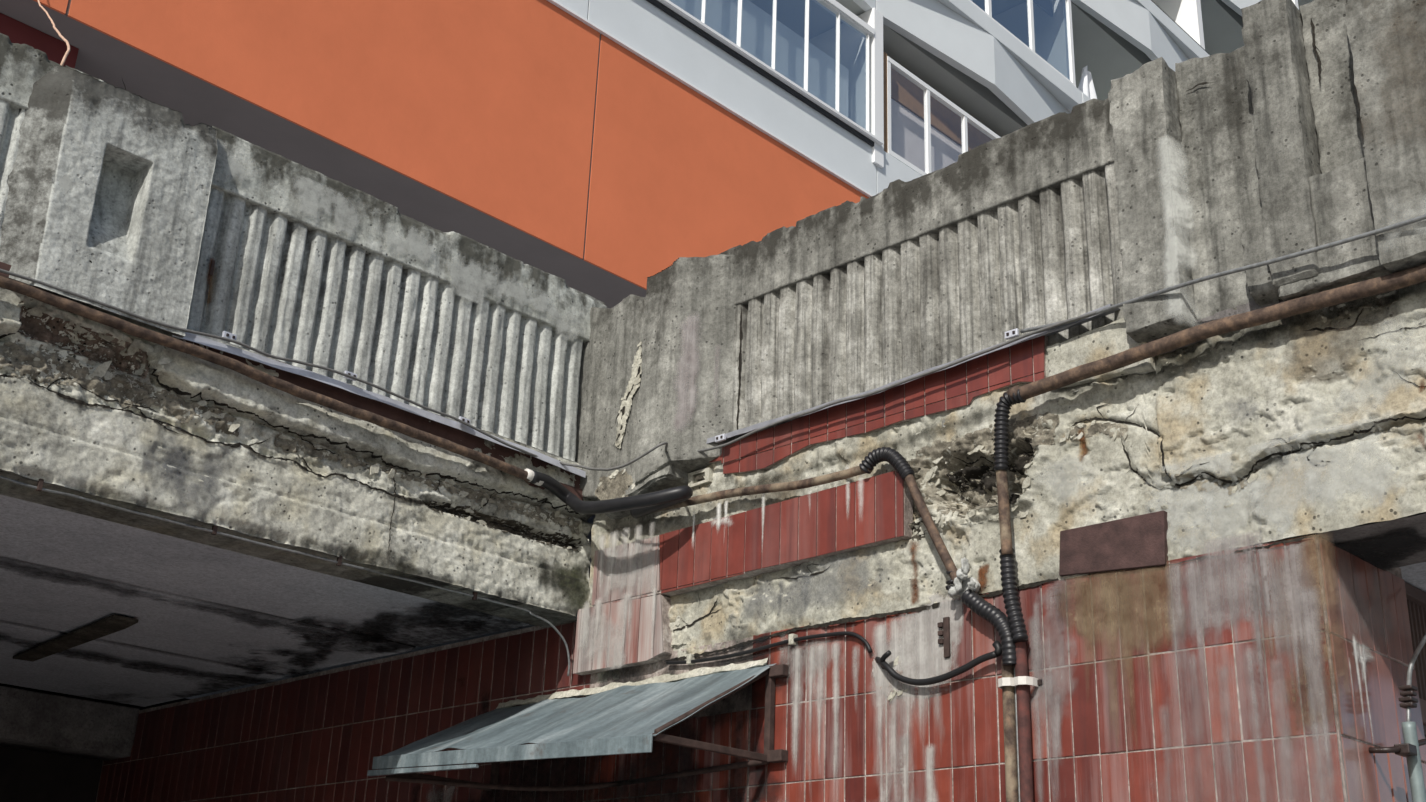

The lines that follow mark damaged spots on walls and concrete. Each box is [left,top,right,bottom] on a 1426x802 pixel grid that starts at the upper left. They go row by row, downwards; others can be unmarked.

crack [1310,18,1321,84]
spalling [0,301,241,437]
crack [0,364,583,551]
spalling [891,412,1128,541]
crack [1071,371,1426,490]
crack [1306,309,1426,341]
leakage [0,561,491,685]
leakage [539,524,655,687]
leakage [1156,423,1426,799]
leakage [473,681,774,802]
leakage [719,627,838,773]
leakage [876,594,963,802]